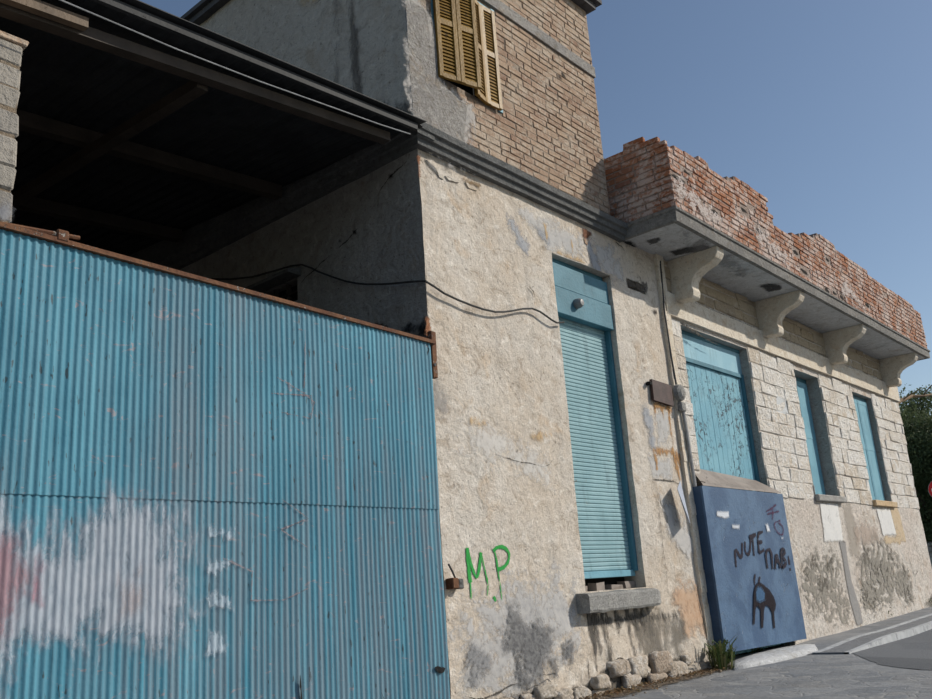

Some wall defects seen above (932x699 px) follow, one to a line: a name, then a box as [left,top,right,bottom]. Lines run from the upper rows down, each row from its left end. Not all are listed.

water stain [349,0,362,94]
peeling [583,228,601,271]
corrosion [653,402,681,480]
water stain [503,601,574,693]
water stain [587,607,687,669]